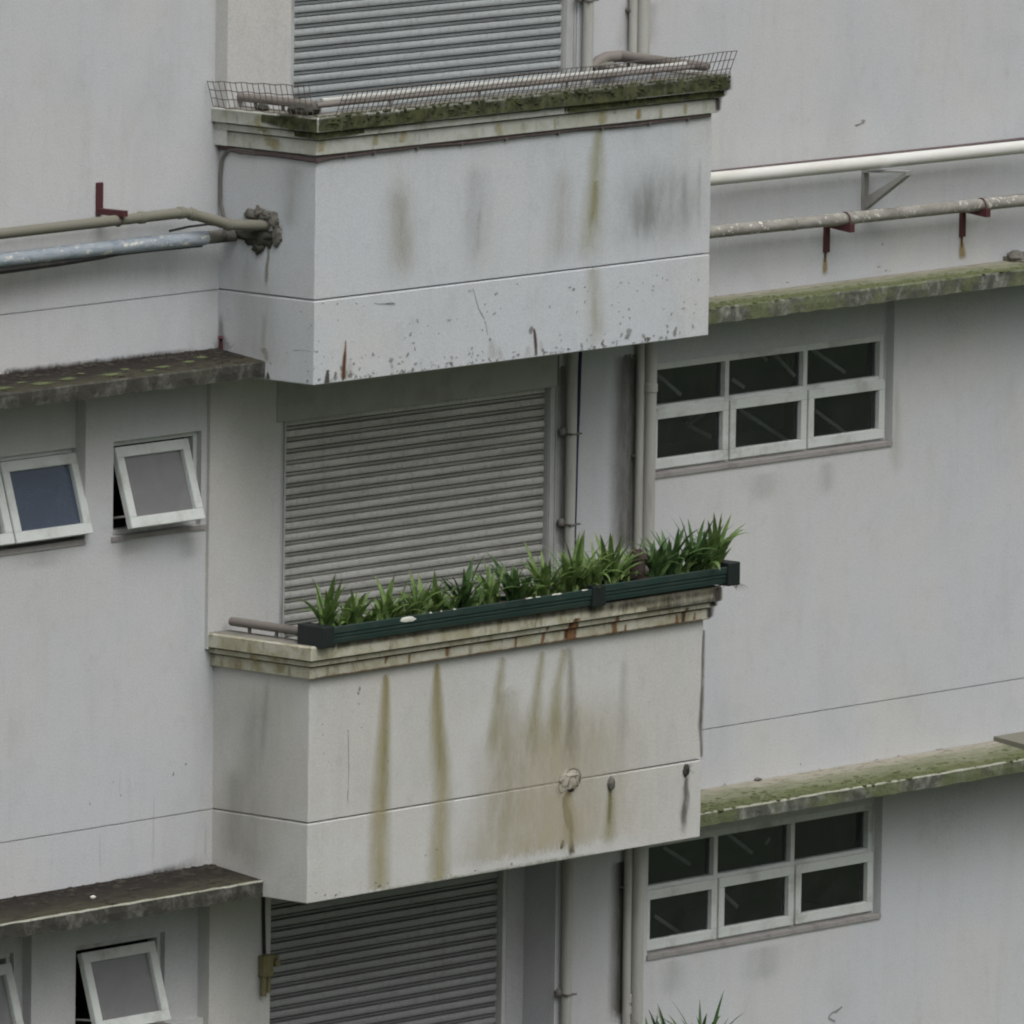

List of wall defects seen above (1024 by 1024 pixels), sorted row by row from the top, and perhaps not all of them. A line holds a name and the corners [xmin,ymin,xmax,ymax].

rust [311,608,708,879]